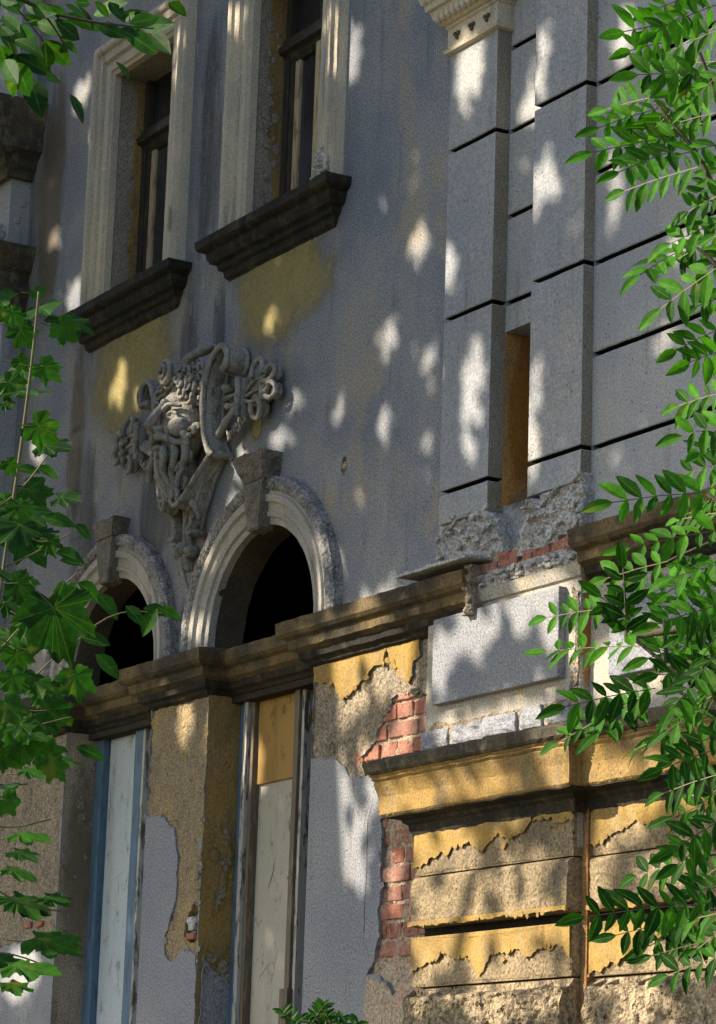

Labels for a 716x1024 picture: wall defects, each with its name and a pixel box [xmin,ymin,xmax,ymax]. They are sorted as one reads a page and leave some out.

spalling [434,472,595,590]
peeling [313,587,583,777]
peeling [144,696,234,1024]
flaking render [371,810,574,993]
peeling [586,896,673,978]
peeling [590,793,715,846]